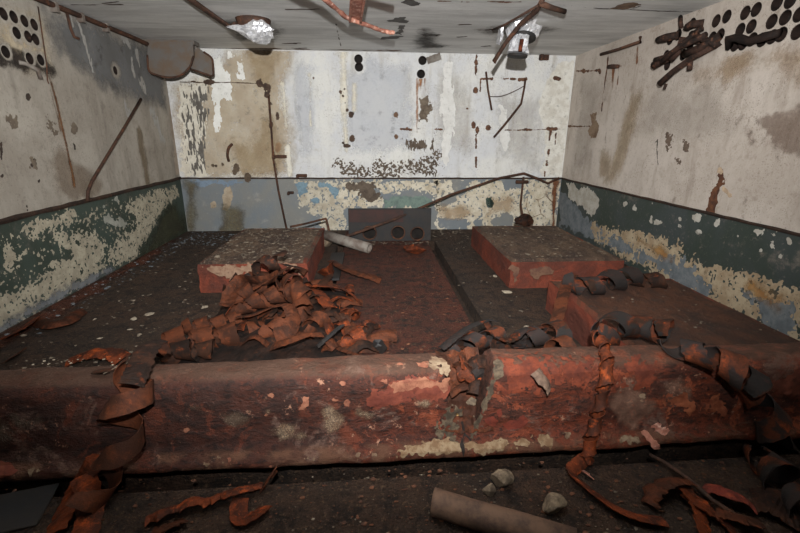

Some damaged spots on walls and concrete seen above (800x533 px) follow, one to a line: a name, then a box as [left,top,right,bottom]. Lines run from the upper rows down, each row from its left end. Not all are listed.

peeling [0,185,234,335]
peeling [294,60,800,341]
corrosion [706,169,725,213]
corrosion [65,347,132,367]